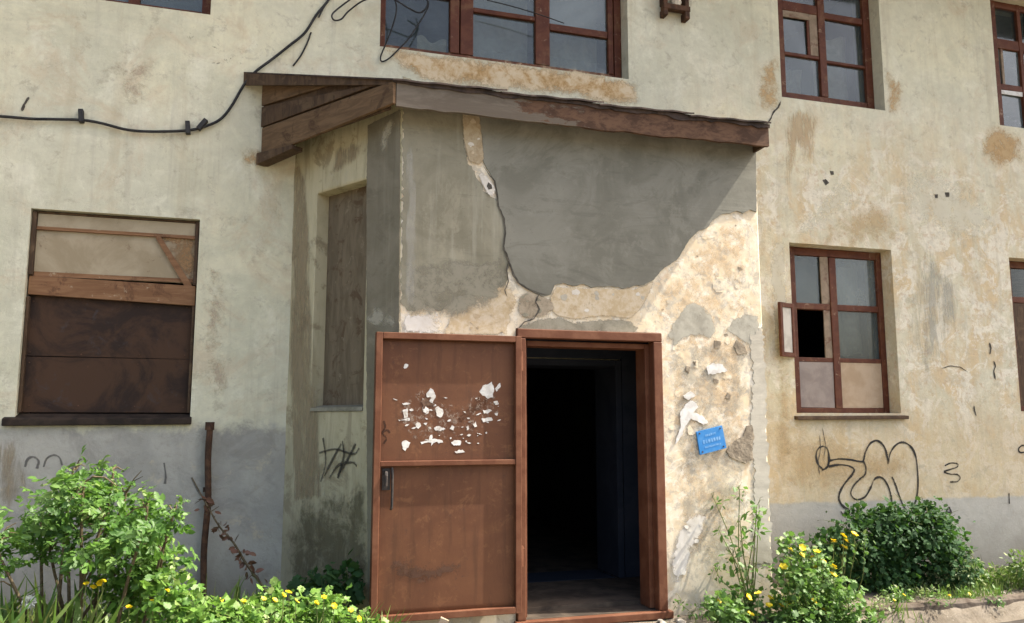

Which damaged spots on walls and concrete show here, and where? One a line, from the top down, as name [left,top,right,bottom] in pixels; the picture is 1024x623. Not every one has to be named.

crack [484,167,547,328]
peeling [698,226,719,240]
peeling [444,282,653,335]
damp [291,167,364,584]
flaking render [685,334,748,373]
flaking render [726,425,755,464]